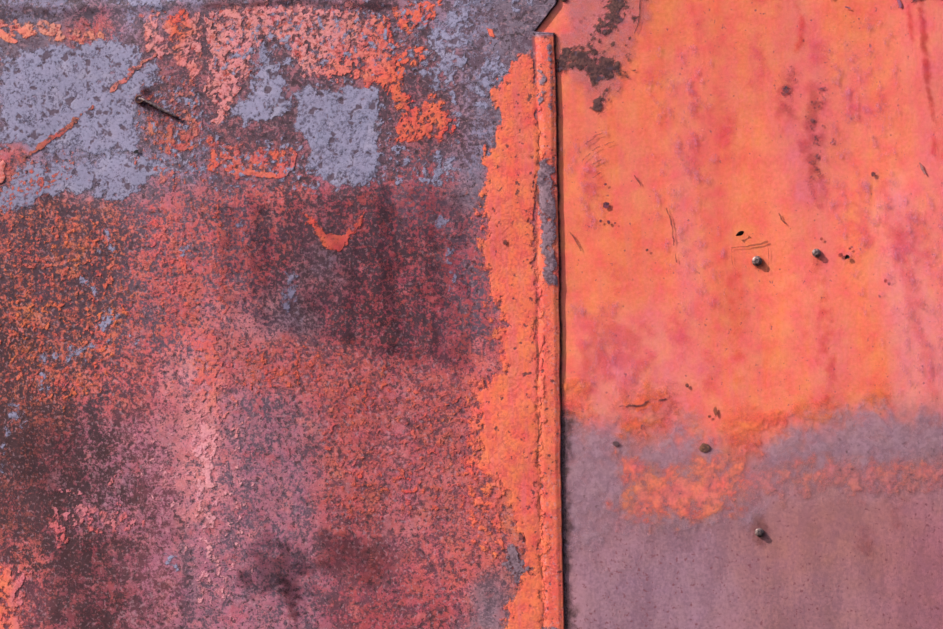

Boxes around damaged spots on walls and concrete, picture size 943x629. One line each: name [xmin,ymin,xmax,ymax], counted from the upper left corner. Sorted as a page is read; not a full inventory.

peeling [475,51,514,111]
spalling [555,0,639,115]
peeling [0,0,491,603]
corrosion [554,33,575,629]
peeling [471,511,506,558]
peeling [0,565,39,629]